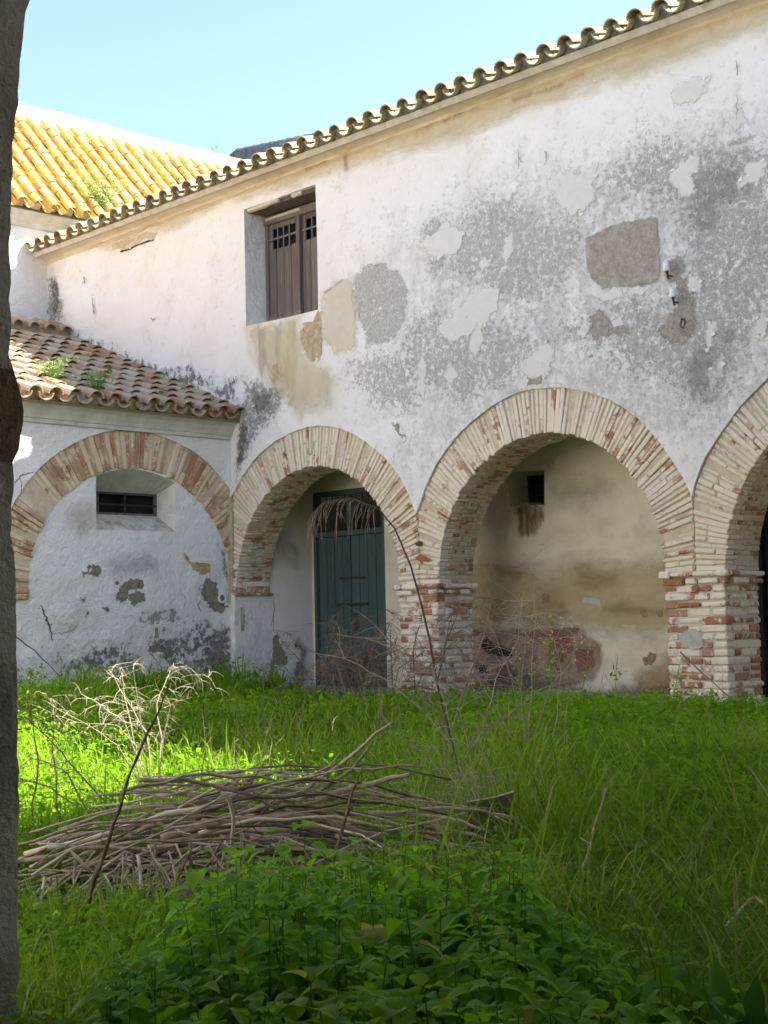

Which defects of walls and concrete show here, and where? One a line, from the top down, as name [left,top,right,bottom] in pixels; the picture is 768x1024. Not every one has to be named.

peeling [355,108,768,408]
flaking render [298,309,322,361]
water stain [76,323,329,472]
flaking render [82,563,102,578]
flaking render [102,577,182,660]
flaking render [181,552,246,632]
peeling [472,628,601,689]